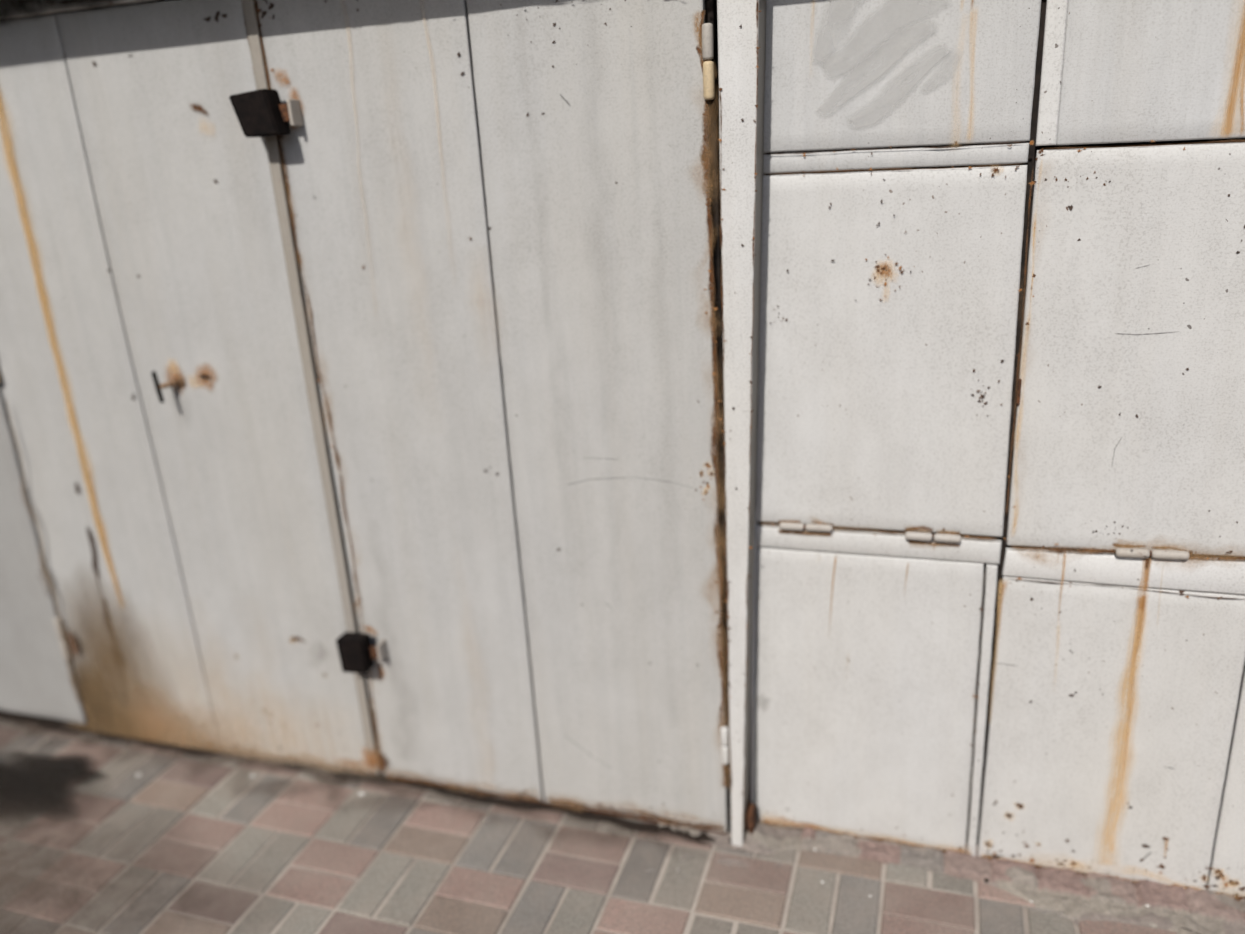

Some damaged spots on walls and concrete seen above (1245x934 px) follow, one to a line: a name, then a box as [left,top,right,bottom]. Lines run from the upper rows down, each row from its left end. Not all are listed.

corrosion [242,6,301,106]
corrosion [276,126,302,269]
corrosion [753,0,1088,325]
corrosion [1135,19,1245,150]
corrosion [0,101,121,601]
corrosion [695,88,747,728]
corrosion [1006,410,1016,526]
leakage [0,609,715,841]
corrosion [340,665,751,840]
corrosion [762,520,1245,878]
corrosion [1132,837,1245,901]